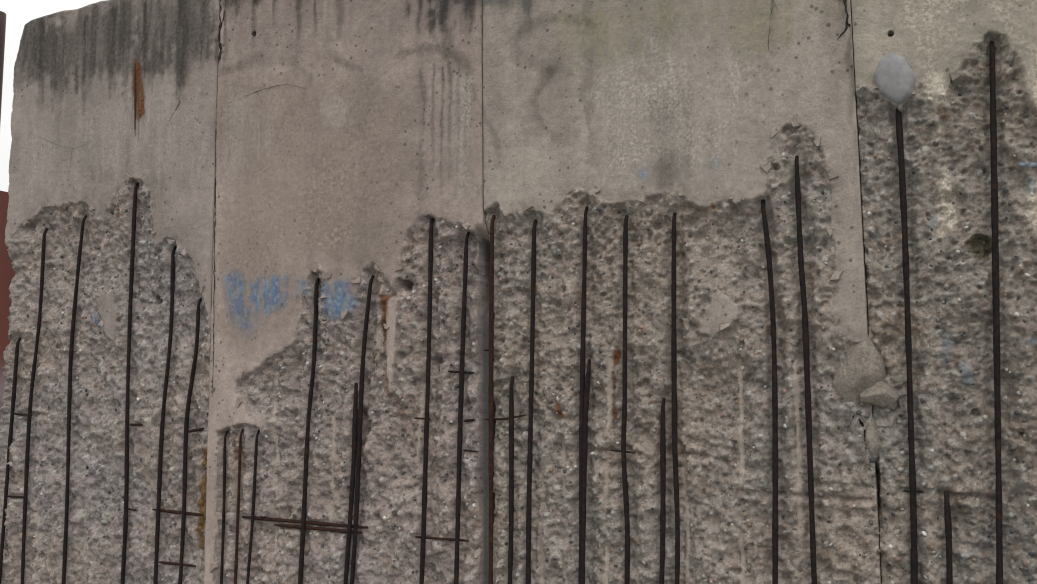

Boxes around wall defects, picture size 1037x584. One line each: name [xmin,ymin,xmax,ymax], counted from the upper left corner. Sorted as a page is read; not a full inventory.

water stain [22,0,218,90]
corrosion [133,60,144,117]
water stain [406,0,507,30]
spalling [210,31,1037,584]
spalling [0,173,211,584]